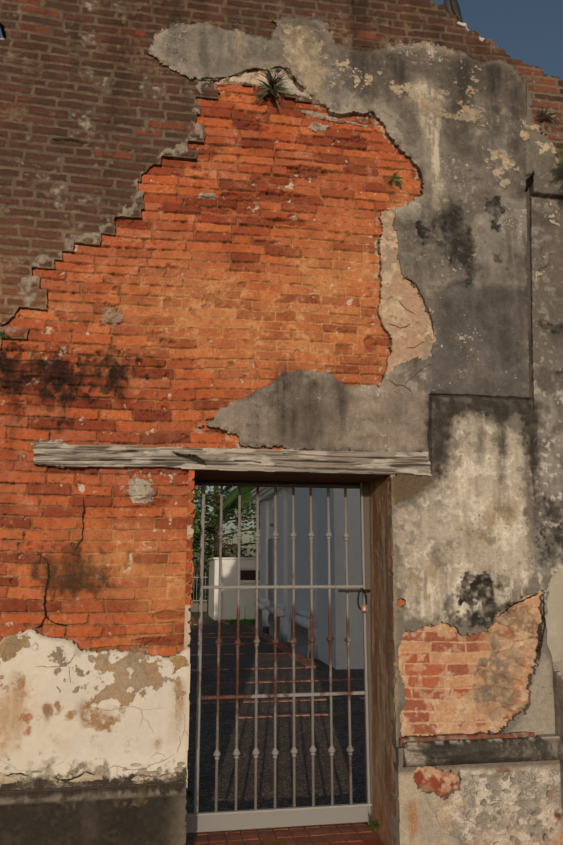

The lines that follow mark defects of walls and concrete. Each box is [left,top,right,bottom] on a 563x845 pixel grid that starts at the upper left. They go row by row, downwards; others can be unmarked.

peeling [335,58,382,90]
leakage [394,58,444,197]
peeling [389,65,491,128]
leakage [0,342,141,409]
spalling [0,69,436,706]
leakage [426,393,563,561]
crack [73,499,85,554]
crack [35,554,68,629]
leakage [456,571,511,632]
spalling [399,590,543,737]
crack [1,690,188,782]
spalling [413,766,553,818]